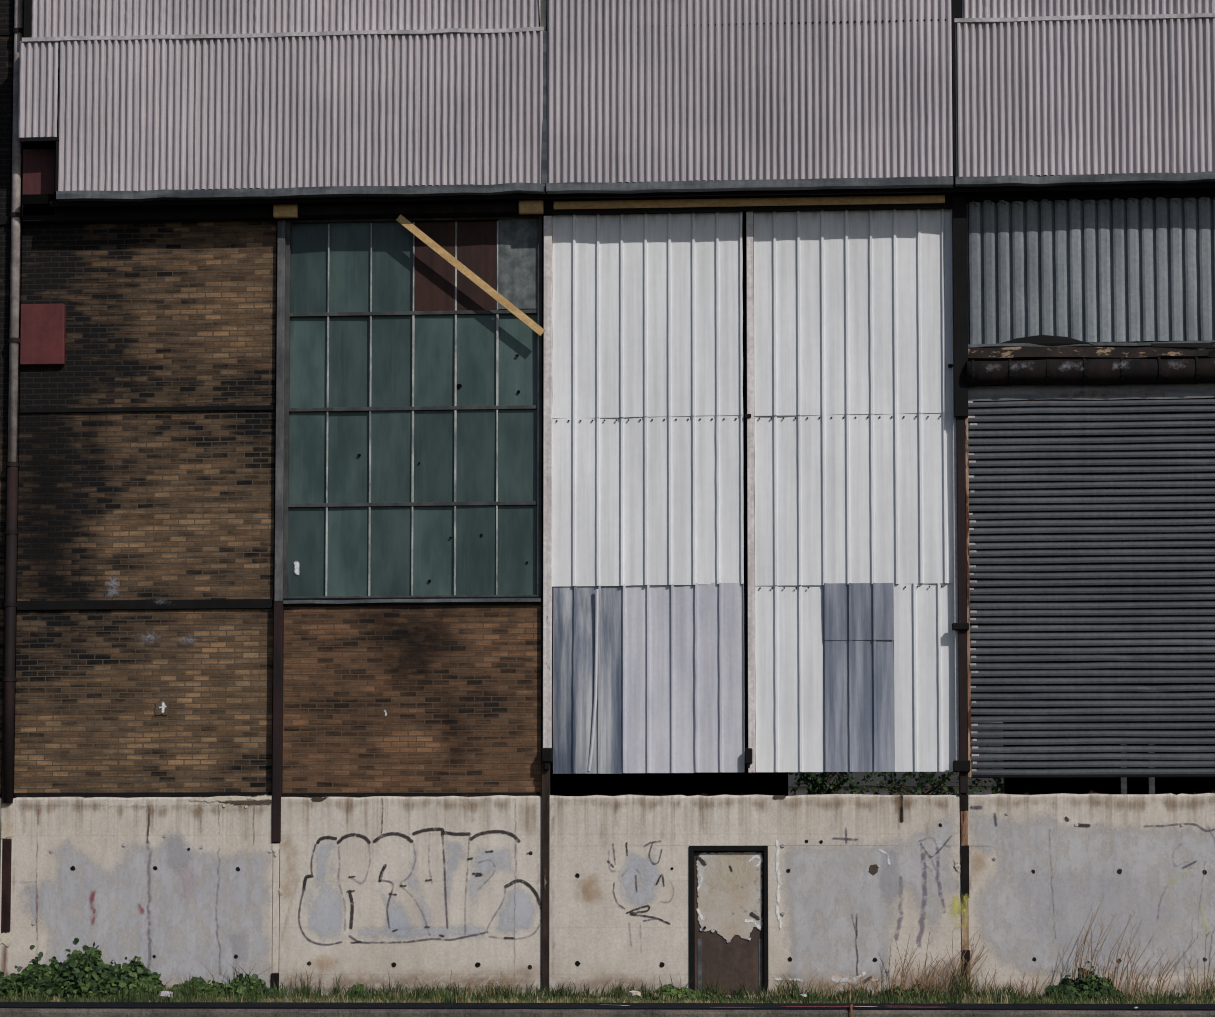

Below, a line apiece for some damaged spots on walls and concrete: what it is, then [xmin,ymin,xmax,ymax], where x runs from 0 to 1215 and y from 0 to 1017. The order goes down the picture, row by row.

peeling [696,852,763,943]
peeling [780,821,960,978]